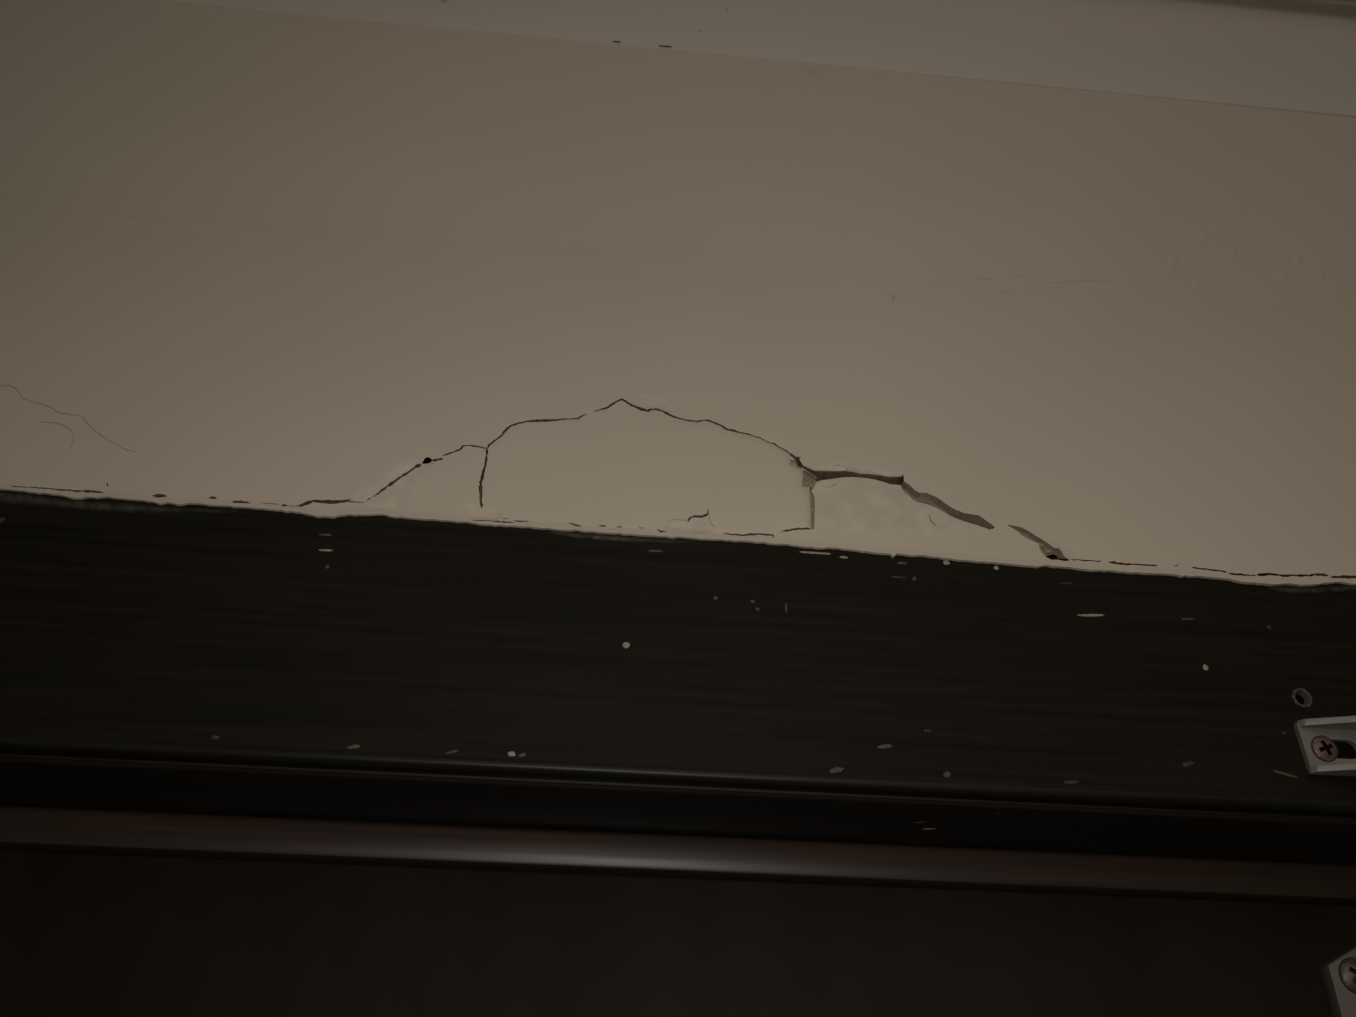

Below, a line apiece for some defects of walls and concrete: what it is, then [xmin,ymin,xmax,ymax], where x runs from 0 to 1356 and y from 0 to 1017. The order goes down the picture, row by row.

crack [12,483,108,493]
crack [208,398,1356,578]